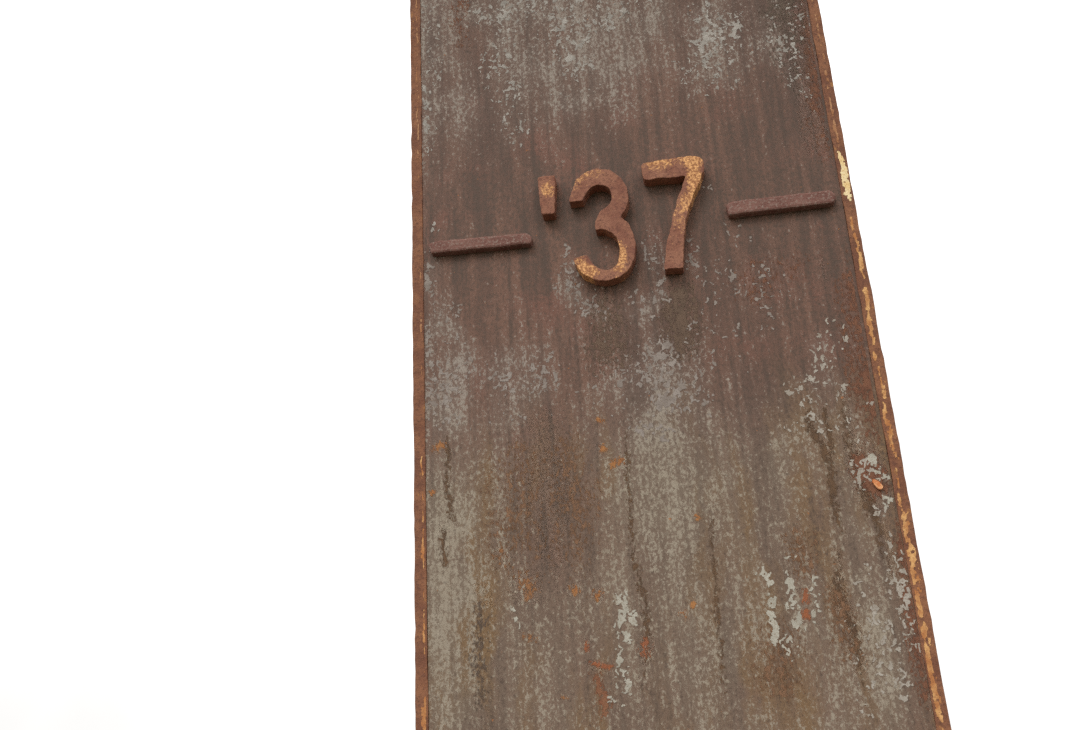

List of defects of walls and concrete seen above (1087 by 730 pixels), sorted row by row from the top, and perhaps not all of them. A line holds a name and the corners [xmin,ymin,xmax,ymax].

peeling [466,0,652,151]
peeling [671,0,852,201]
rust [656,282,702,364]
peeling [611,230,800,442]
rust [429,436,456,567]
rust [481,433,651,677]
peeling [607,589,638,707]
rust [694,514,727,694]
peeling [755,555,822,662]
rust [750,527,864,703]
peeling [783,217,944,730]
rust [804,250,929,710]